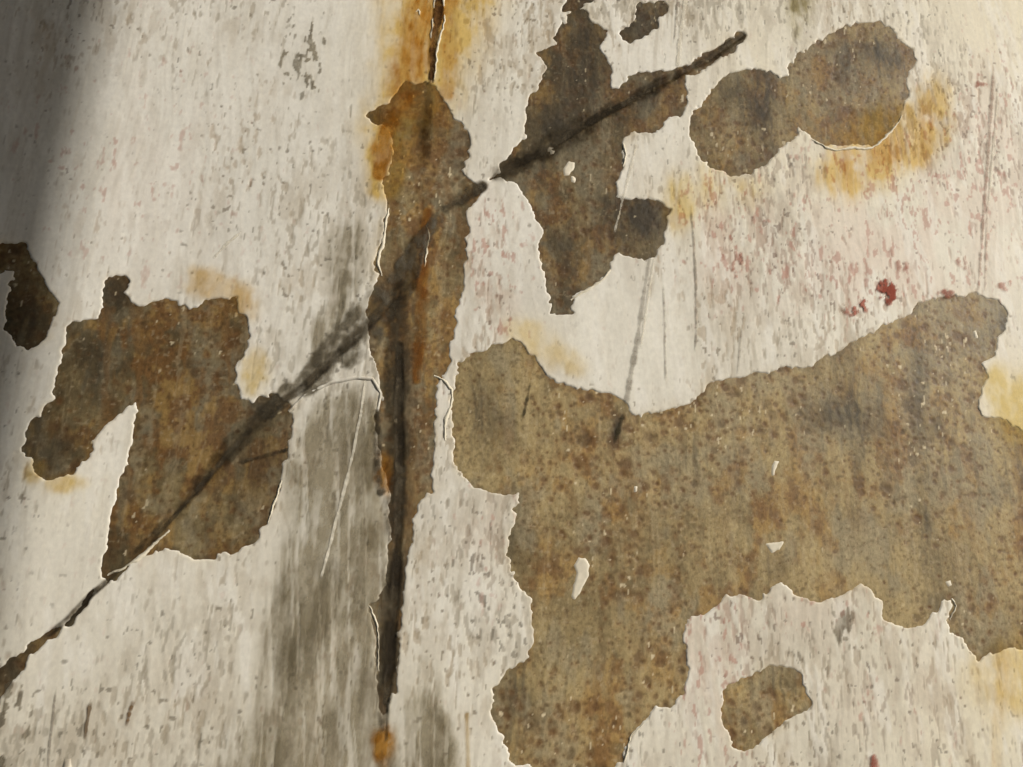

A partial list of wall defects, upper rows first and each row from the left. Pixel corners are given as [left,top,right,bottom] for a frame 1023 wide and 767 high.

crack [414,0,446,82]
crack [508,91,650,172]
peeling [489,0,916,315]
peeling [0,242,59,350]
crack [265,181,488,417]
peeling [21,275,293,583]
peeling [365,81,1023,767]
peeling [0,589,94,698]
crack [88,582,108,601]
crack [376,414,405,704]